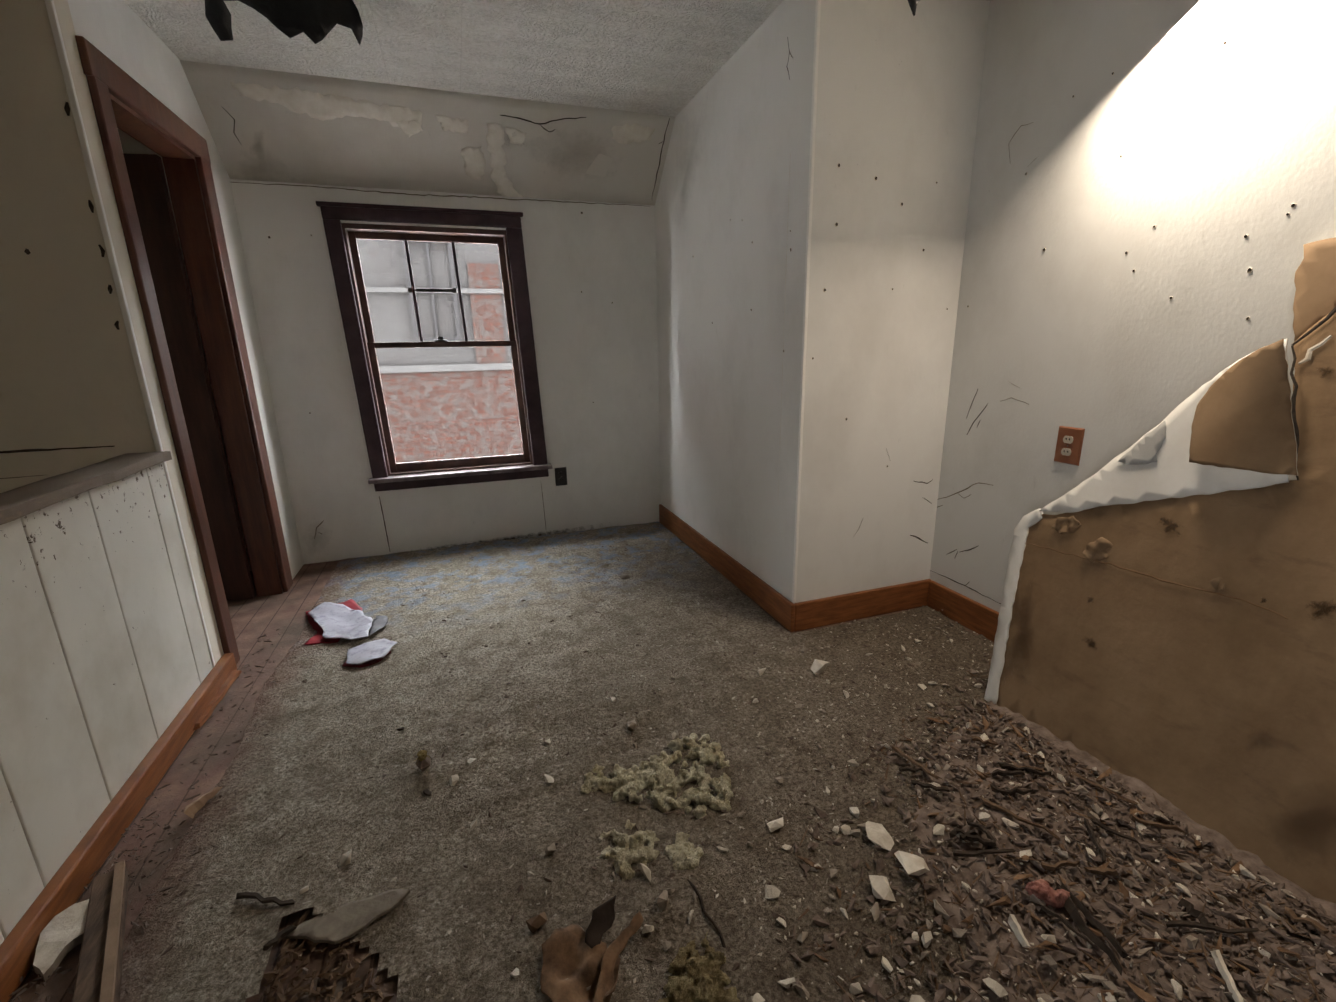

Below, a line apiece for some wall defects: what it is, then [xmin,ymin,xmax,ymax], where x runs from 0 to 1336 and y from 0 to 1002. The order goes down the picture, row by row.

spalling [1293,237,1336,342]